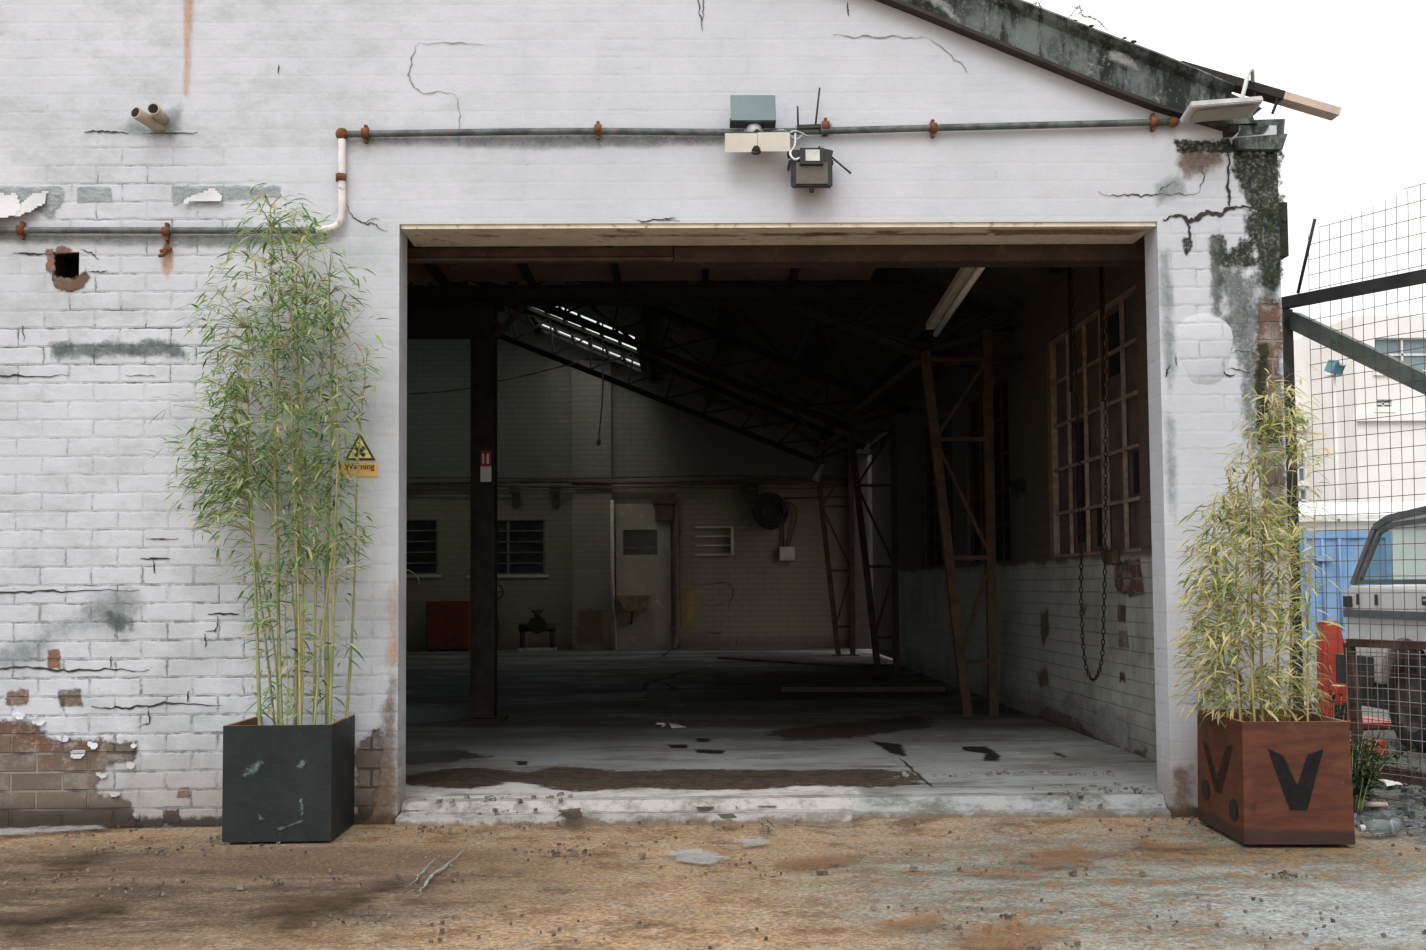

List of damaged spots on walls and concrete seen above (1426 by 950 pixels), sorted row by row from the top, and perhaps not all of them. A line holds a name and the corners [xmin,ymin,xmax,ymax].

crack [833,0,967,72]
crack [407,42,482,147]
peeling [0,186,112,218]
peeling [172,185,280,205]
crack [1098,153,1282,240]
damp [1160,139,1234,198]
spalling [45,245,90,292]
spalling [0,688,141,830]